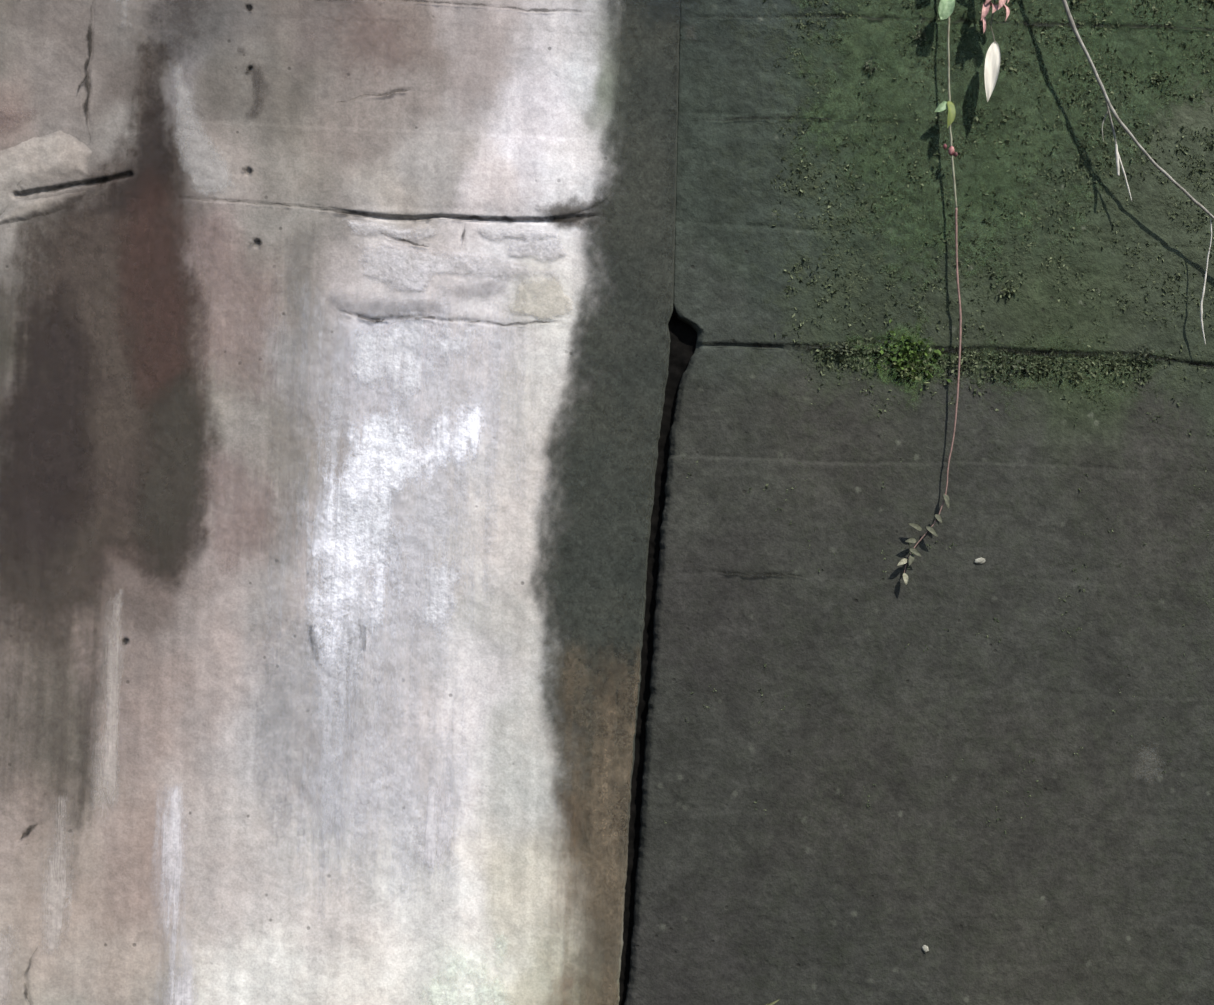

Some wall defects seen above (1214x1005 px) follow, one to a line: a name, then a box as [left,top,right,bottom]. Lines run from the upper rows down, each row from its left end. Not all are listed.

crack [18,174,127,195]
damp [546,203,600,227]
crack [335,211,589,247]
crack [753,342,829,350]
crack [877,339,962,353]
crack [996,347,1097,356]
crack [1146,353,1214,368]
damp [0,45,230,951]
efflorescence [313,312,497,815]
crack [619,305,723,1005]
damp [566,656,640,1005]